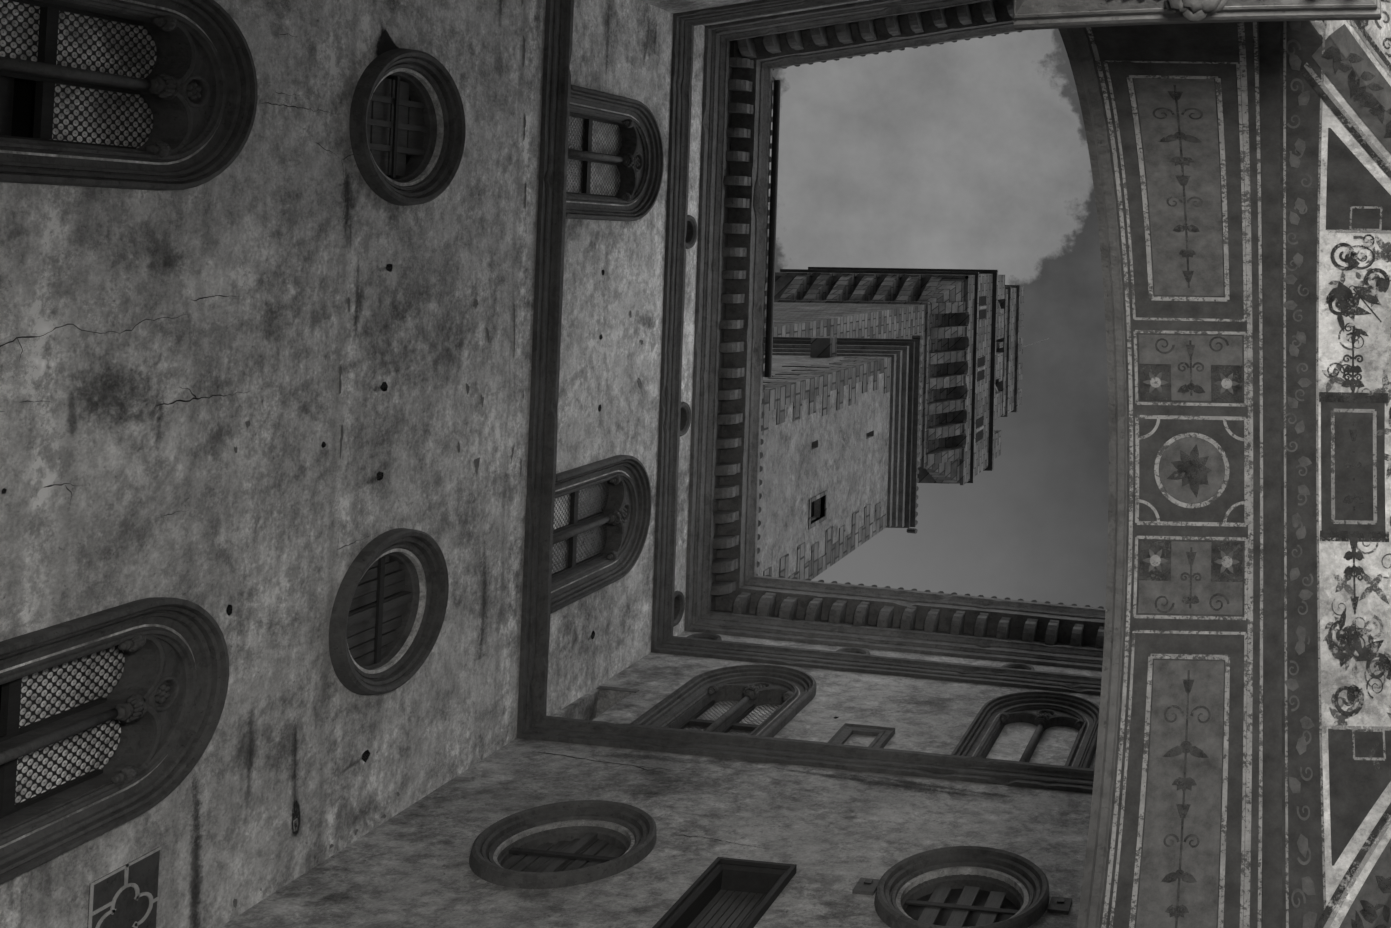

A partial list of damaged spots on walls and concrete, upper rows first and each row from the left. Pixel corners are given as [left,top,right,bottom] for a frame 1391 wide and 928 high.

crack [0,295,236,361]
crack [157,387,247,406]